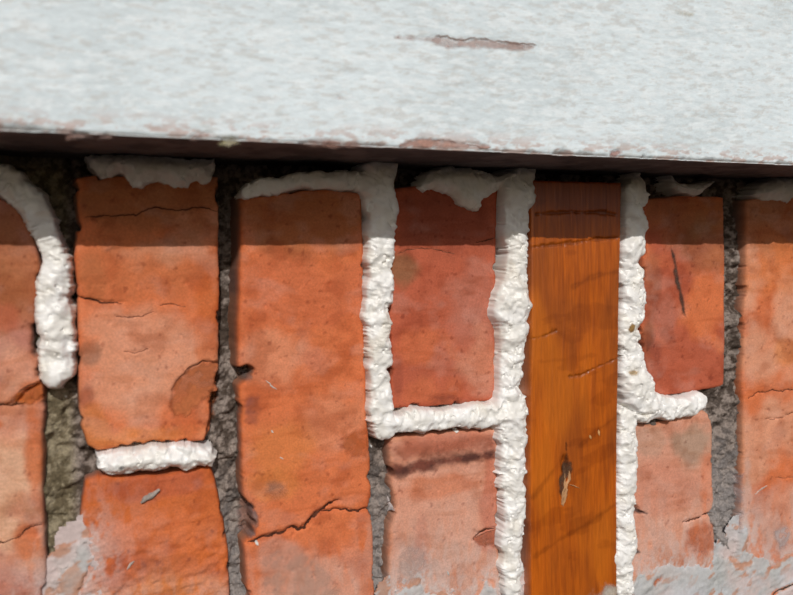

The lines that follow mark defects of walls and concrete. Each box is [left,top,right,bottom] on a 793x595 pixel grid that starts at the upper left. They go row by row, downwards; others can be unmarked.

crack [87,206,218,218]
spalling [236,365,248,379]
crack [0,389,45,406]
spalling [7,381,43,404]
spalling [170,360,218,419]
spalling [239,497,258,536]
crack [248,499,367,542]
spalling [474,529,496,546]